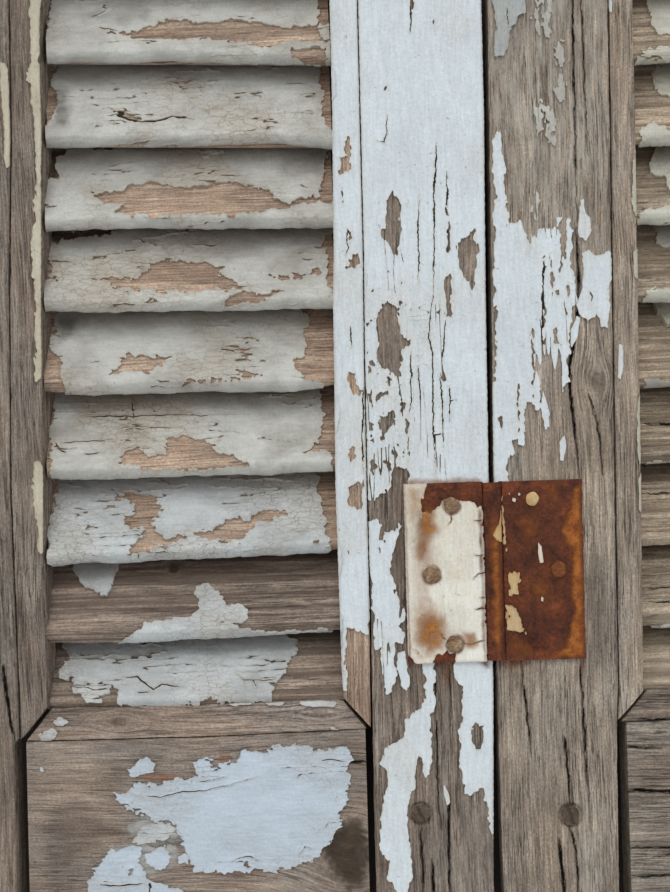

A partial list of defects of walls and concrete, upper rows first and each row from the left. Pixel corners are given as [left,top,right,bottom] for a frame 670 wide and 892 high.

peeling [492,0,567,146]
peeling [638,122,670,192]
peeling [492,131,612,482]
peeling [26,0,494,892]
rust [409,615,444,650]
rust [419,512,436,557]
rust [450,634,476,653]
rust [492,528,500,643]
peeling [505,571,527,635]
rust [558,488,583,656]
crack [564,667,590,799]
crack [558,826,579,892]